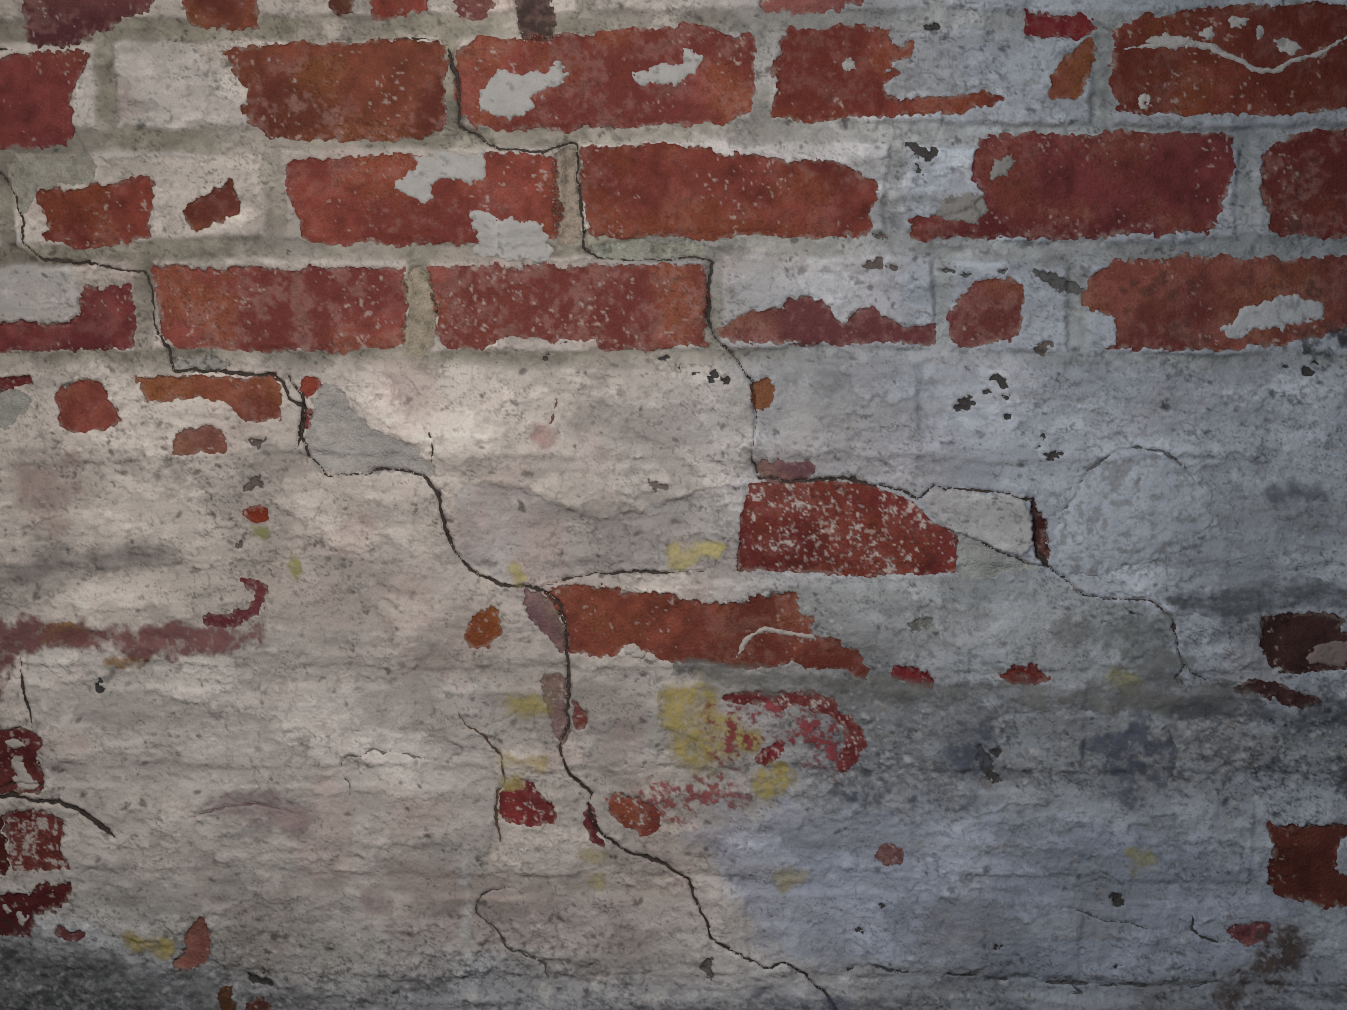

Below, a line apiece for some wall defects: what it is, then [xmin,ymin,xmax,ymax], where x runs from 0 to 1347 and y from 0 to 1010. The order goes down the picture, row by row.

peeling [0,0,156,250]
peeling [134,0,1347,450]
peeling [0,283,137,353]
peeling [54,379,122,433]
crack [378,37,1220,687]
peeling [736,458,959,578]
crack [0,172,837,1010]
peeling [523,583,870,680]
peeling [1233,610,1347,710]
peeling [0,726,85,942]
peeling [1265,820,1347,910]
damp [1217,925,1306,1010]